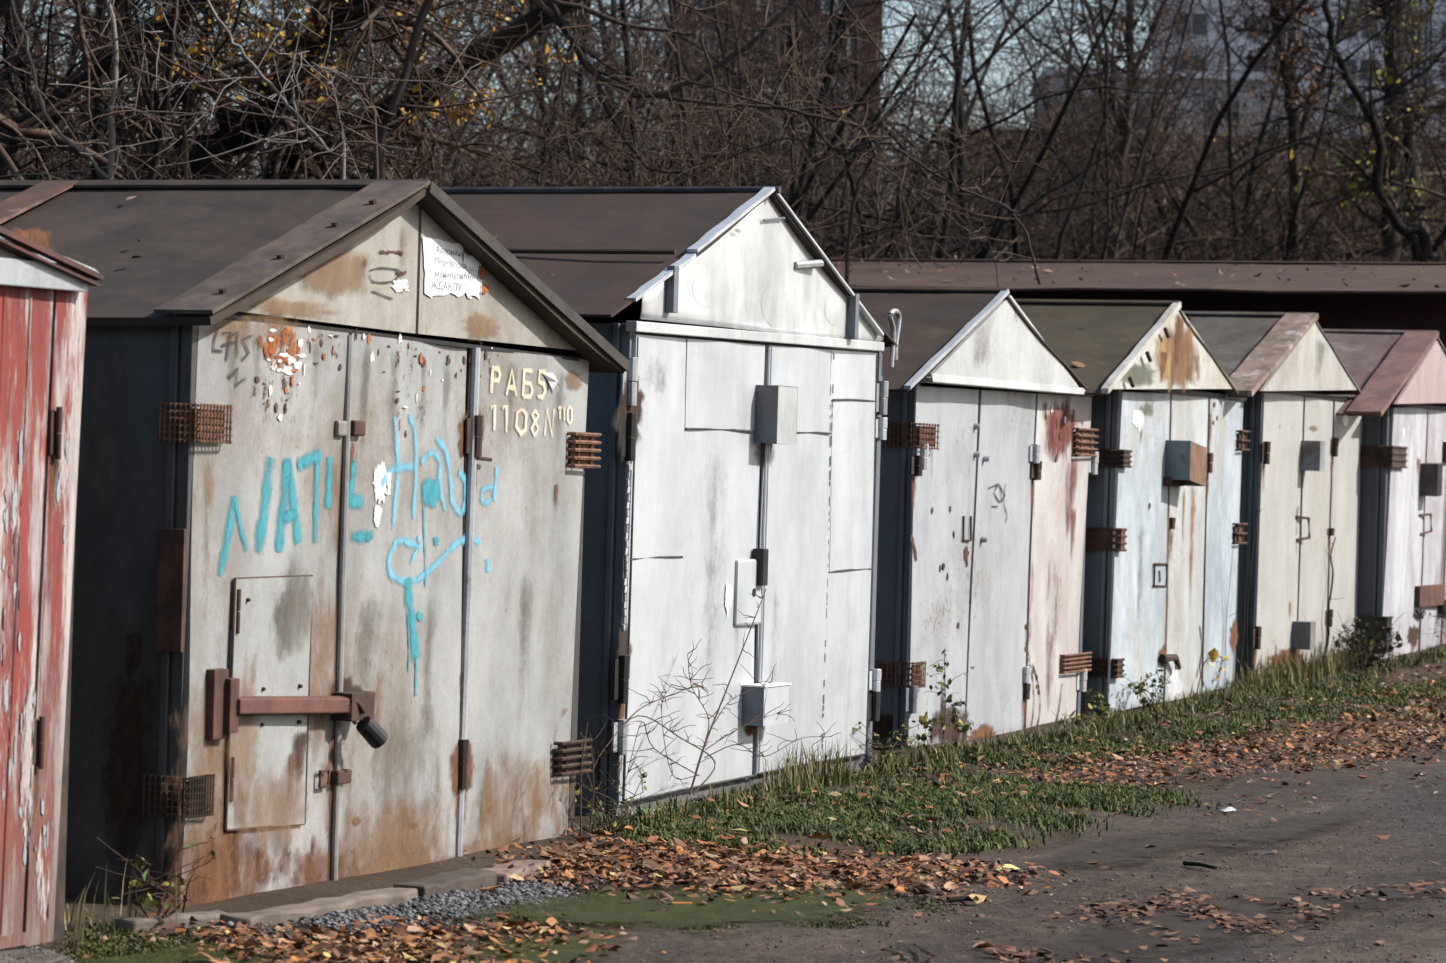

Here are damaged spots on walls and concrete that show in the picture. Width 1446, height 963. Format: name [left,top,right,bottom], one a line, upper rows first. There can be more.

peeling [253,323,499,437]
rust [1157,316,1200,391]
peeling [56,416,69,544]
rust [1066,459,1077,550]
peeling [0,430,53,922]
rust [278,568,380,721]
rust [156,714,431,912]
rust [451,673,566,855]